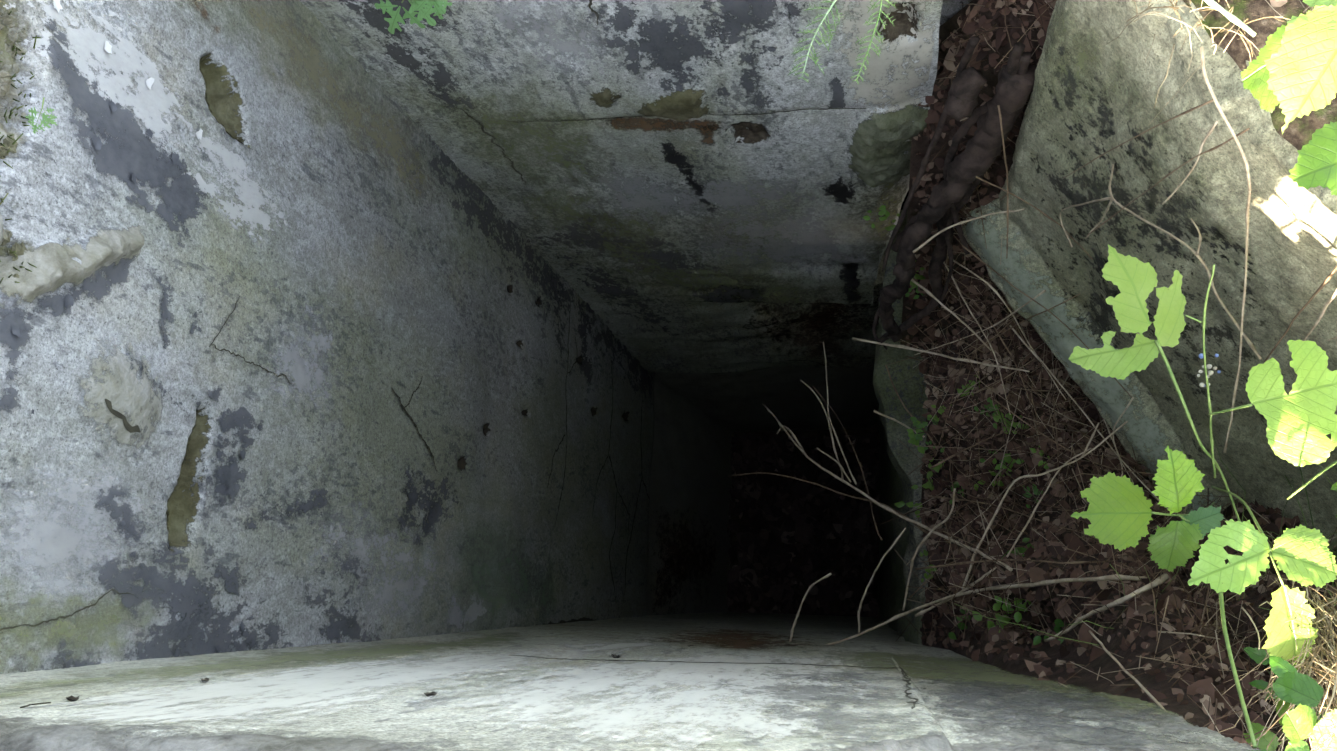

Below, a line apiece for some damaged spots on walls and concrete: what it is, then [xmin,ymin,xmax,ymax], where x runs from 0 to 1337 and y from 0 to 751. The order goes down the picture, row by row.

peeling [585,0,805,121]
spalling [876,2,921,42]
rust [606,117,722,146]
peeling [0,0,287,425]
crack [209,296,292,384]
crack [392,376,437,471]
peeling [95,353,292,661]
peeling [244,484,330,533]
crack [0,589,134,631]